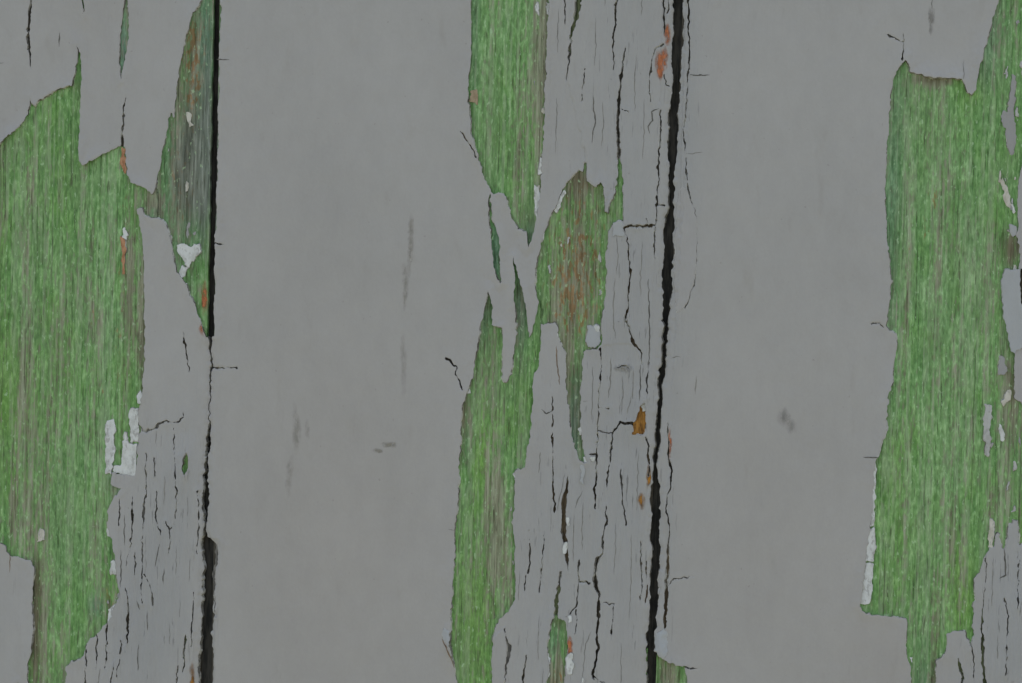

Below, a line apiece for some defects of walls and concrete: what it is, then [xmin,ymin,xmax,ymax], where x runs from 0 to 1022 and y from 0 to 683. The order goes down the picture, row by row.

crack [26,5,34,65]
peeling [0,0,222,683]
crack [85,414,200,683]
peeling [451,0,624,683]
crack [504,0,706,683]
corrosion [656,26,670,78]
peeling [860,0,1022,683]
crack [958,551,1019,683]